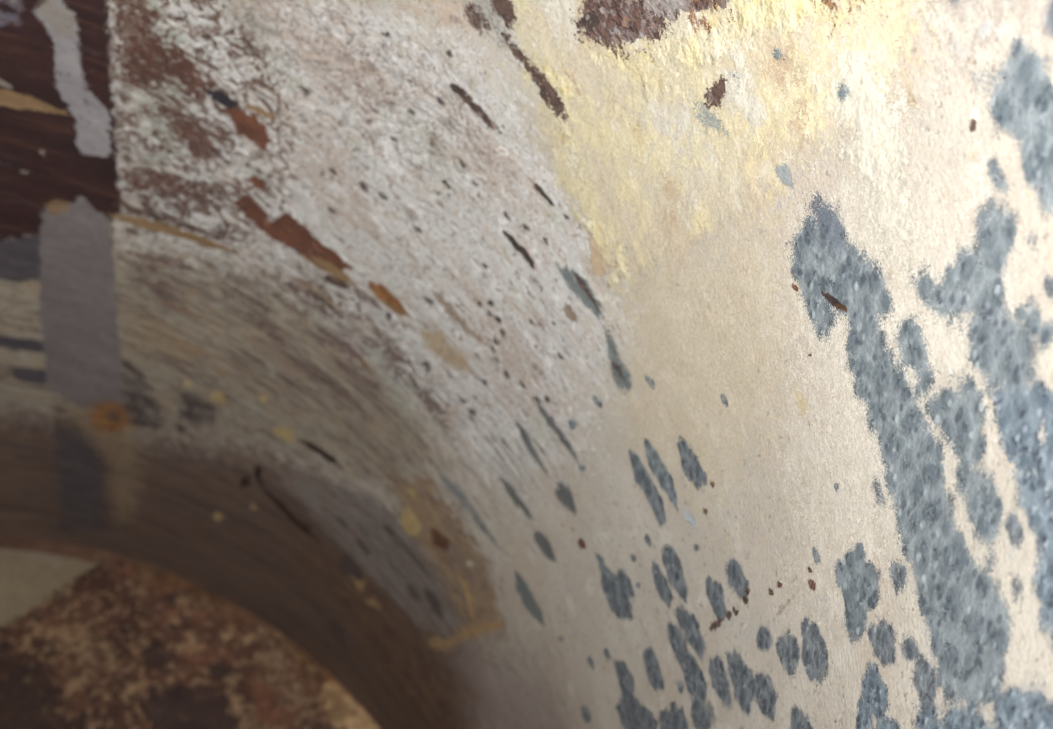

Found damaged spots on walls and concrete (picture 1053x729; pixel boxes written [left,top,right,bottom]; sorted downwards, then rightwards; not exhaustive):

peeling [0,0,113,158]
rust [0,0,413,321]
peeling [969,106,980,132]
rust [0,560,375,729]